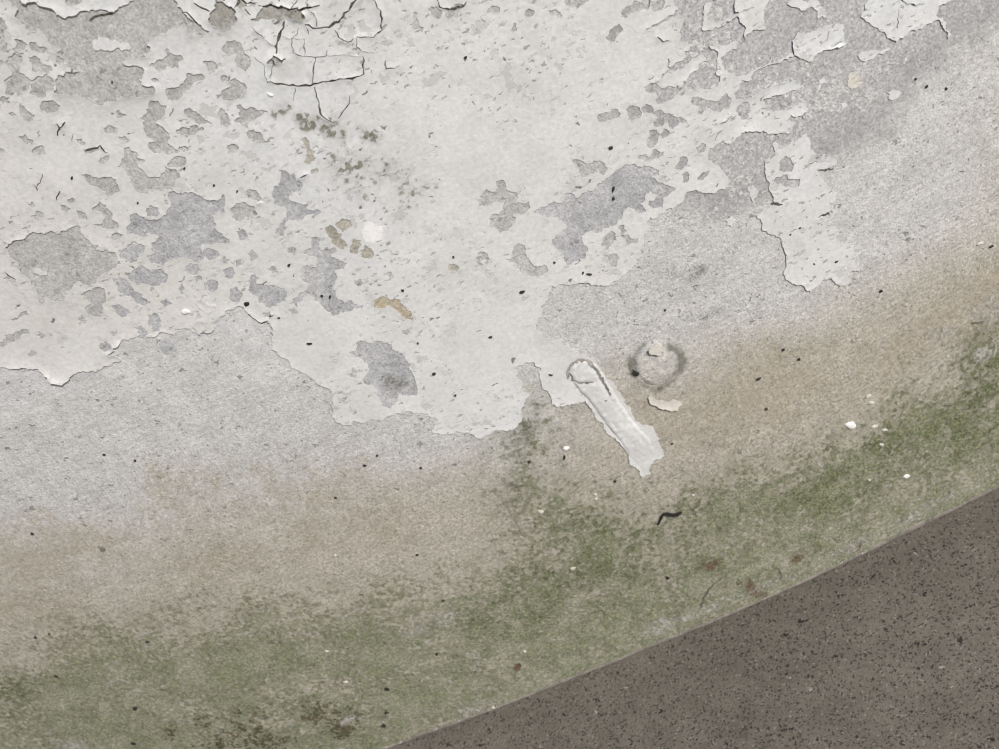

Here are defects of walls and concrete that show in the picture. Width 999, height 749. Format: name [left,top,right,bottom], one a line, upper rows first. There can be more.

peeling [410,4,464,32]
crack [437,0,466,10]
crack [182,0,398,127]
peeling [478,0,994,292]
peeling [0,0,419,354]
peeling [476,252,489,266]
water stain [973,346,997,362]
peeling [349,340,418,409]
peeling [648,395,682,412]
water stain [643,597,724,636]